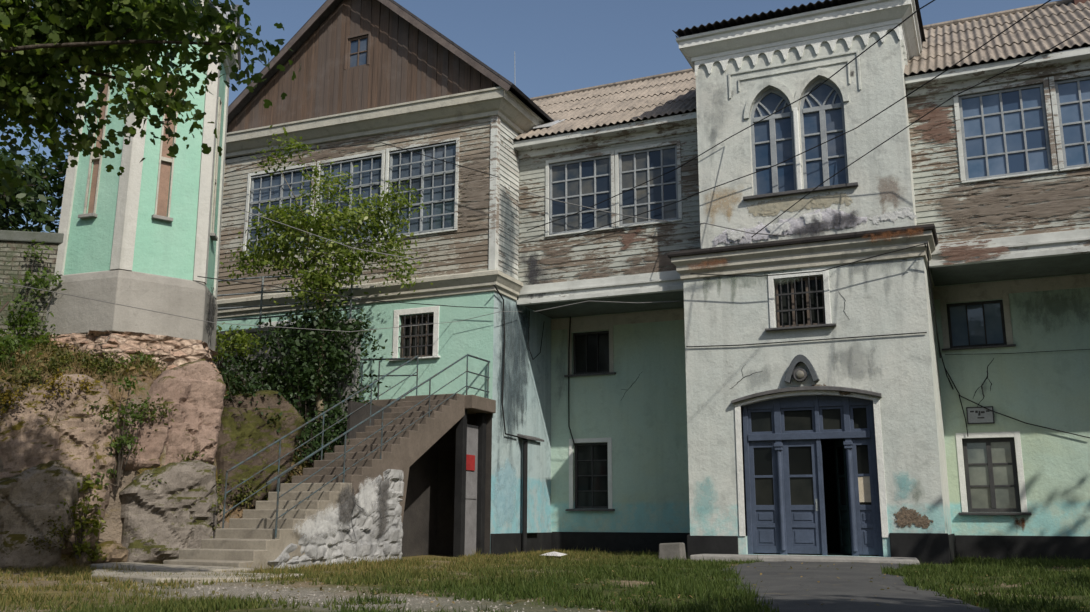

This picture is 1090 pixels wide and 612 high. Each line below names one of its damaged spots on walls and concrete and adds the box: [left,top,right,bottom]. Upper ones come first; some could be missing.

peeling [909,102,957,145]
peeling [293,138,375,168]
peeling [457,147,490,232]
leakage [795,211,857,236]
peeling [540,227,676,280]
leakage [500,306,527,431]
crack [973,358,994,407]
flaking render [295,479,390,538]
spalling [893,506,933,529]